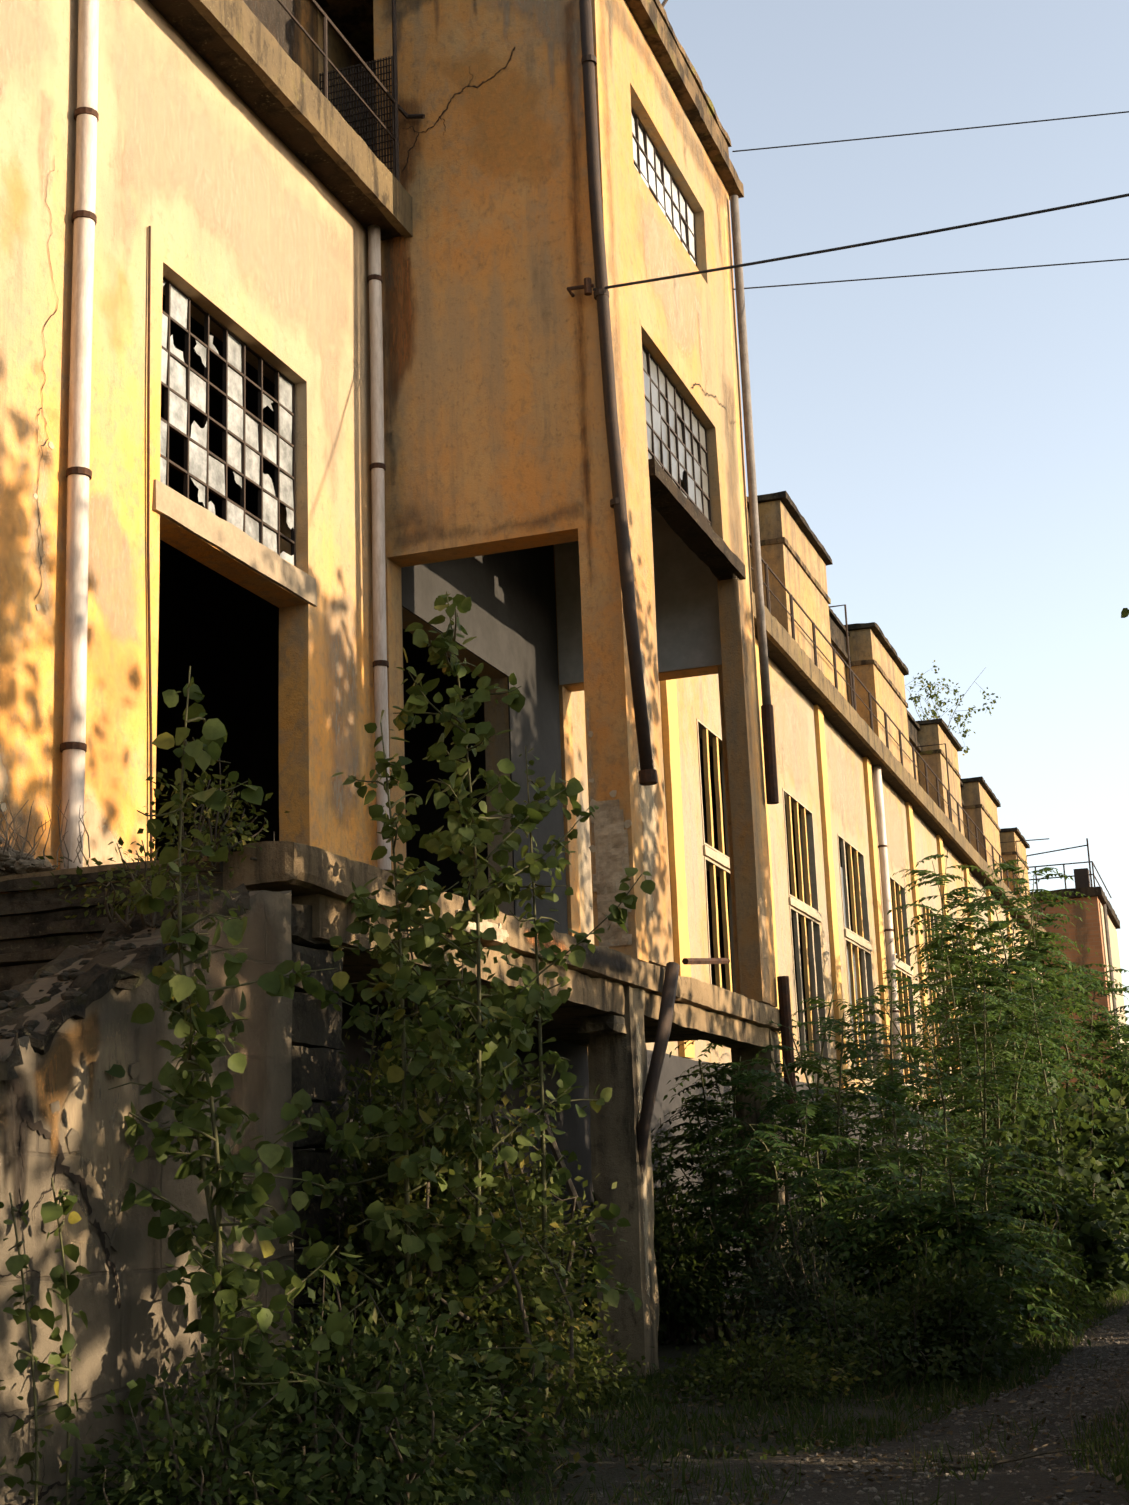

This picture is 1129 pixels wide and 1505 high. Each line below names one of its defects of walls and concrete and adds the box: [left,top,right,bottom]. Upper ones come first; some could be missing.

crack [401,47,515,171]
crack [34,155,59,600]
spalling [589,649,656,948]
crack [0,1055,121,1309]
rust [37,1013,99,1154]